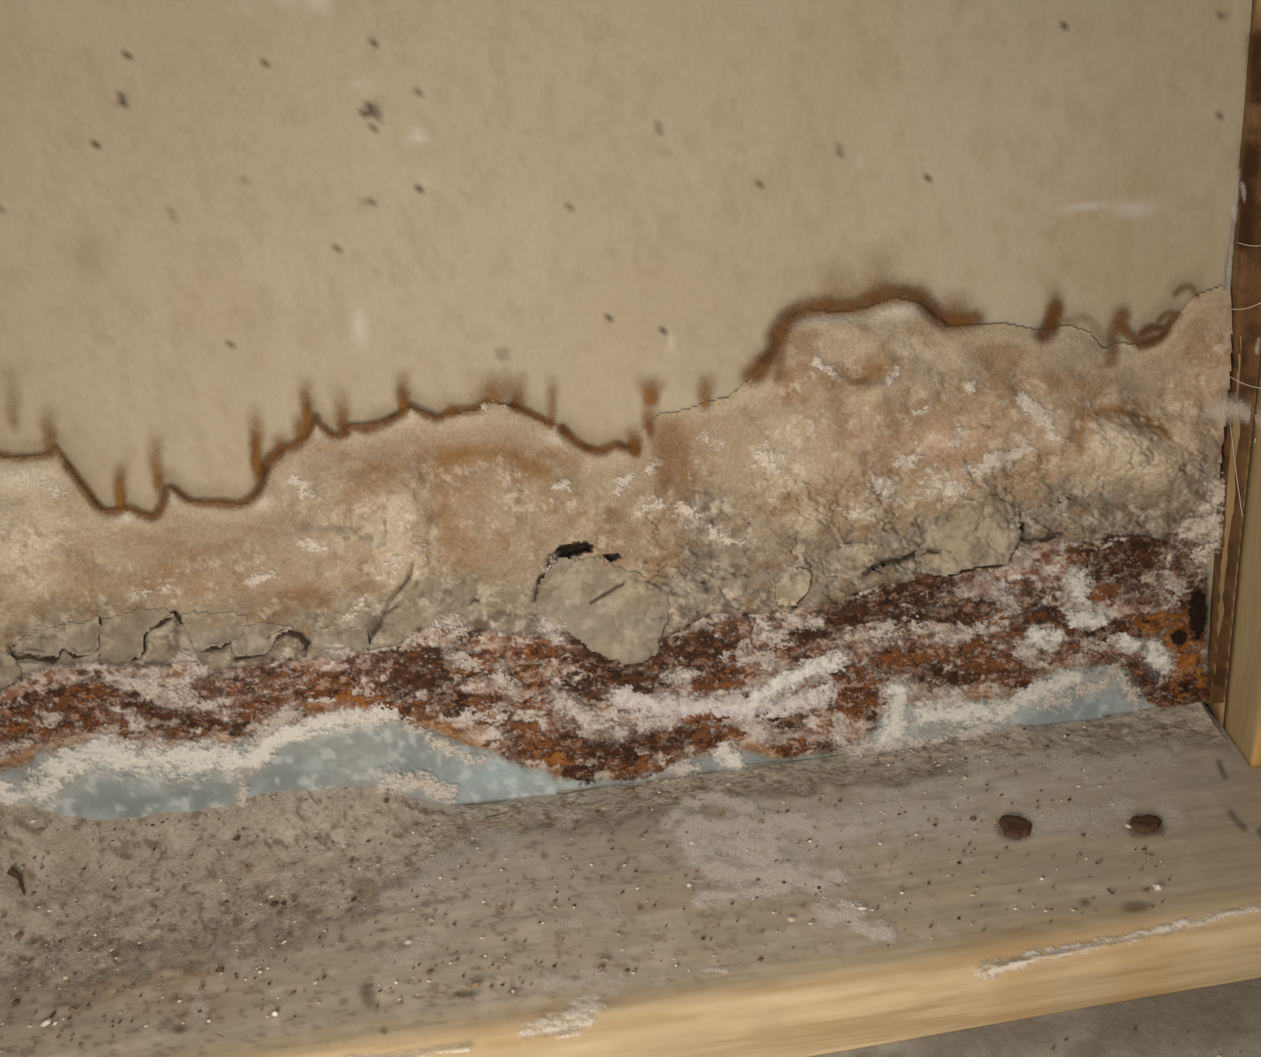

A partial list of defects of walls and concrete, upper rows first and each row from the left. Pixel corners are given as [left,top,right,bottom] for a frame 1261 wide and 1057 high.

damp [743,286,981,381]
damp [1036,304,1062,342]
damp [1107,311,1179,364]
damp [0,384,664,522]
efflorescence [832,391,1067,521]
efflorescence [631,495,745,547]
crack [864,523,1061,577]
crack [590,583,624,604]
crack [9,619,101,684]
crack [131,612,182,661]
crack [205,629,310,660]
rust [0,514,1209,786]